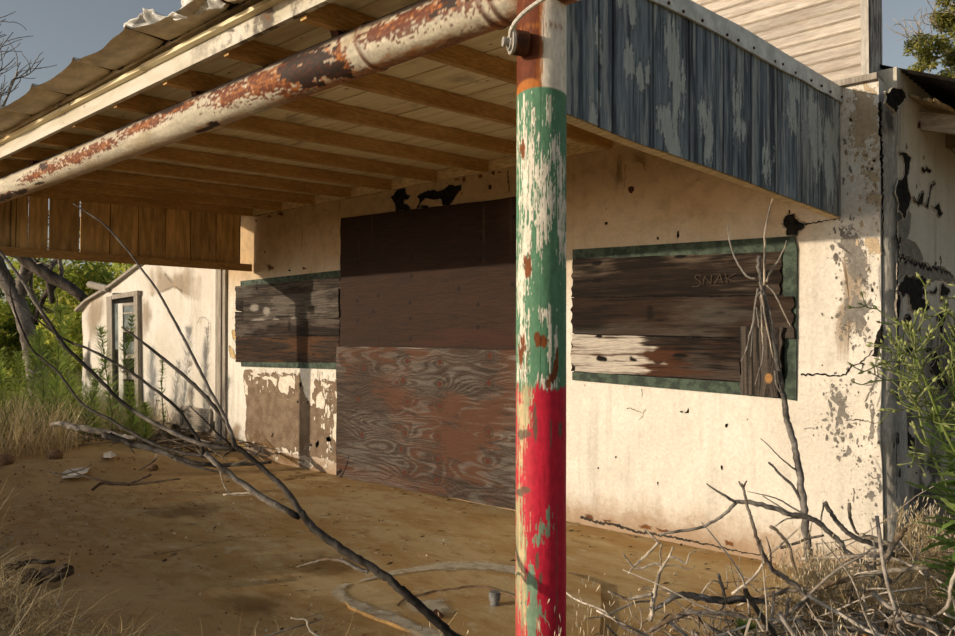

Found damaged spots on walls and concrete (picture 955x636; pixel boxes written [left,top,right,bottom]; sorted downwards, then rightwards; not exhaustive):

peeling [227,367,337,468]
spalling [389,182,463,211]
crack [801,102,953,497]
peeling [821,82,955,393]